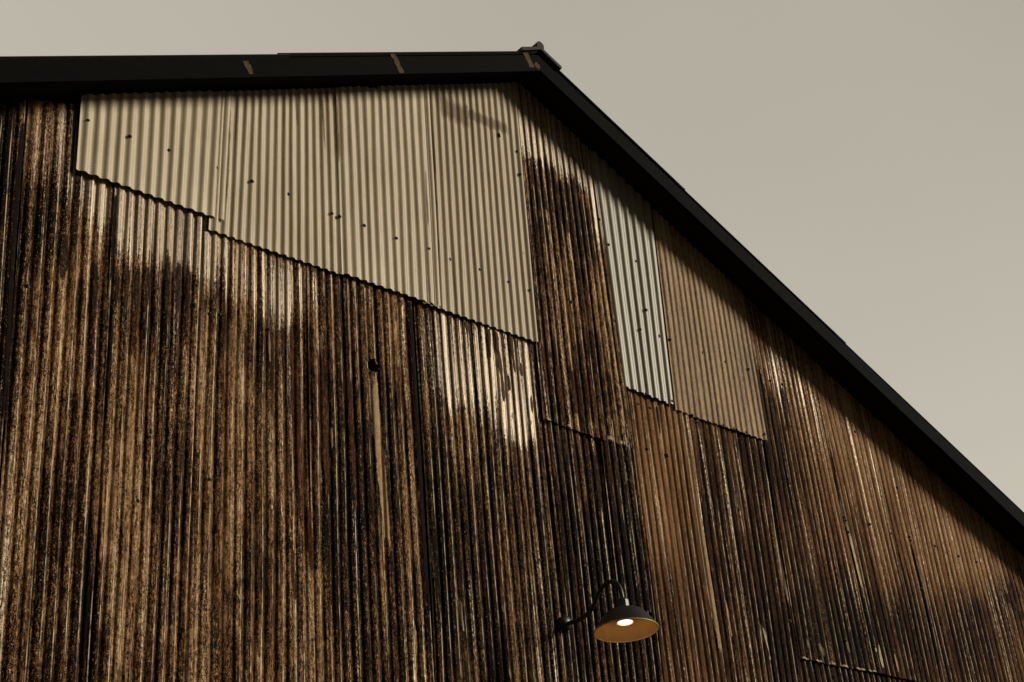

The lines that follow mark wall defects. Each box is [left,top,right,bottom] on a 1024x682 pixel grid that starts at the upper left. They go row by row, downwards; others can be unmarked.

corrosion [531,152,598,269]
corrosion [60,195,117,428]
corrosion [289,327,314,574]
corrosion [408,302,433,614]
corrosion [539,292,597,424]
corrosion [757,366,791,465]
corrosion [79,532,91,674]
corrosion [701,487,719,598]
corrosion [911,544,939,661]